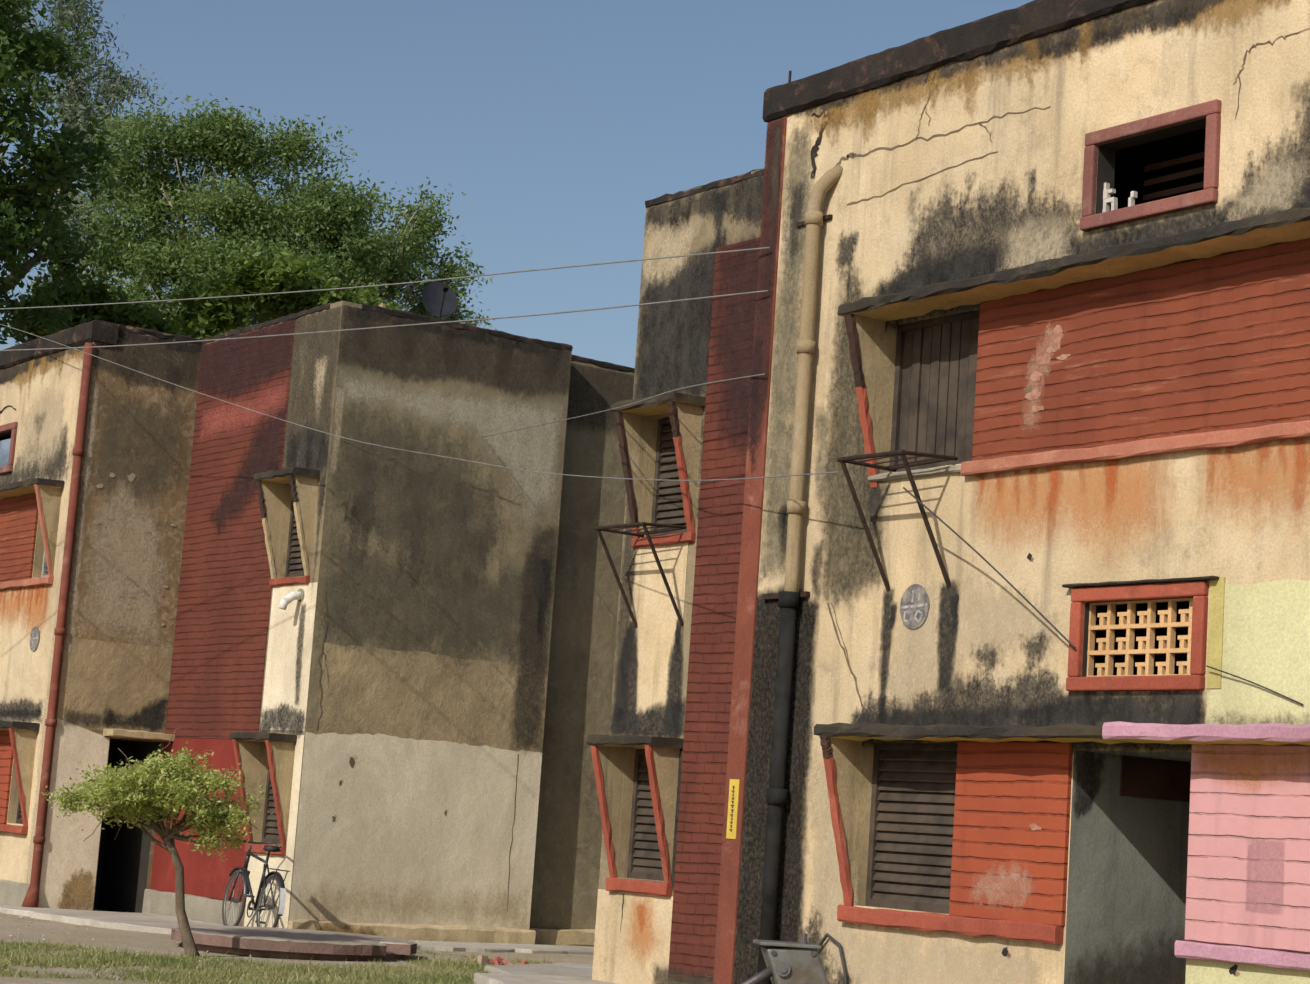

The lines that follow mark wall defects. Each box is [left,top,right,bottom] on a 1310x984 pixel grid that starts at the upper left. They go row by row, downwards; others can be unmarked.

crack [811,77,1051,205]
crack [1233,28,1309,119]
rust [0,585,48,627]
water stain [0,570,62,884]
water stain [0,0,1288,749]
water stain [610,499,685,889]
water stain [733,587,784,984]
water stain [776,88,1310,984]
peeling [1024,325,1071,425]
rust [979,458,1155,535]